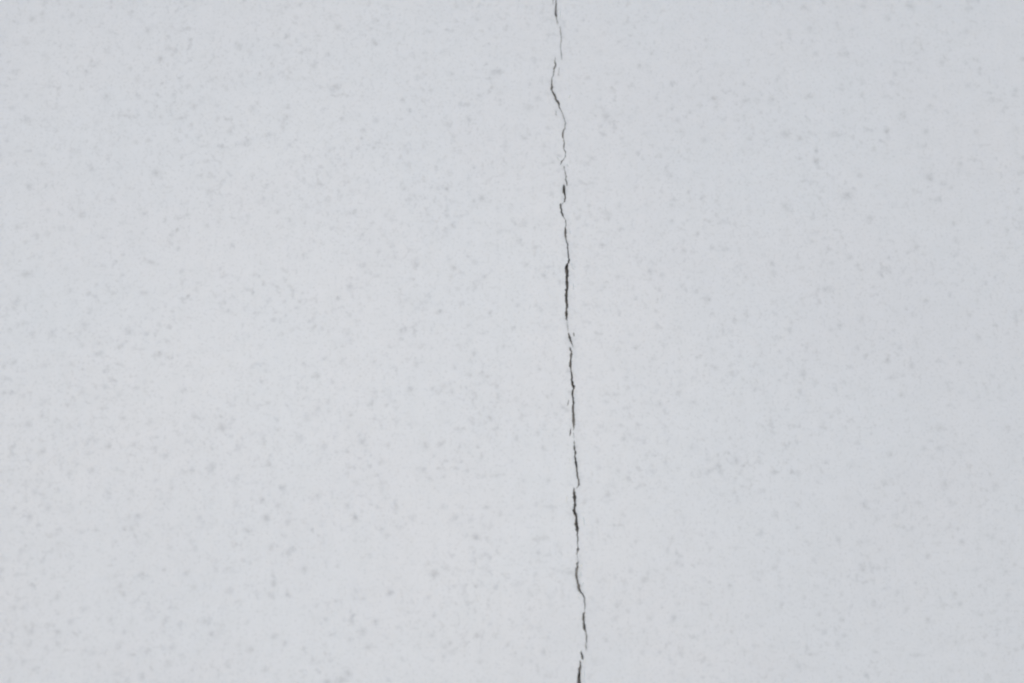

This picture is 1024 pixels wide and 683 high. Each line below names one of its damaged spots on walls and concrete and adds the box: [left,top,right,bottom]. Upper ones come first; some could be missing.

crack [550,0,587,683]